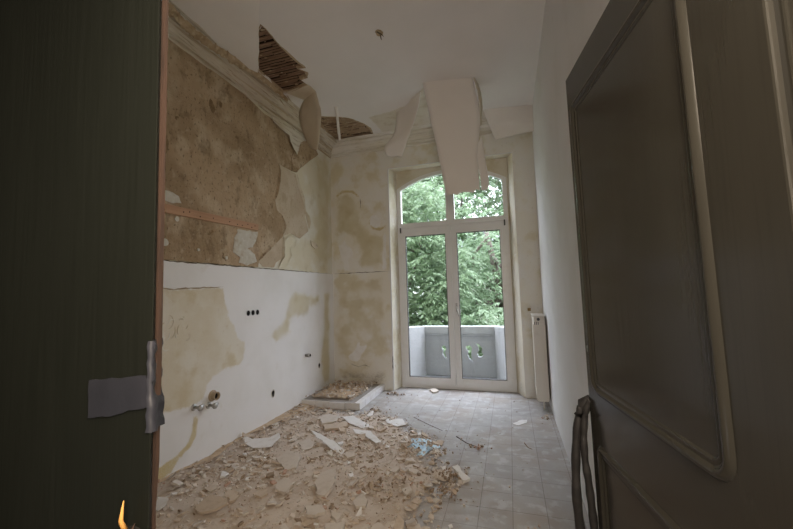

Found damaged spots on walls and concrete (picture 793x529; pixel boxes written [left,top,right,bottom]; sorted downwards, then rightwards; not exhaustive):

flaking render [164,39,318,268]
damp [158,286,245,480]
damp [271,157,400,384]